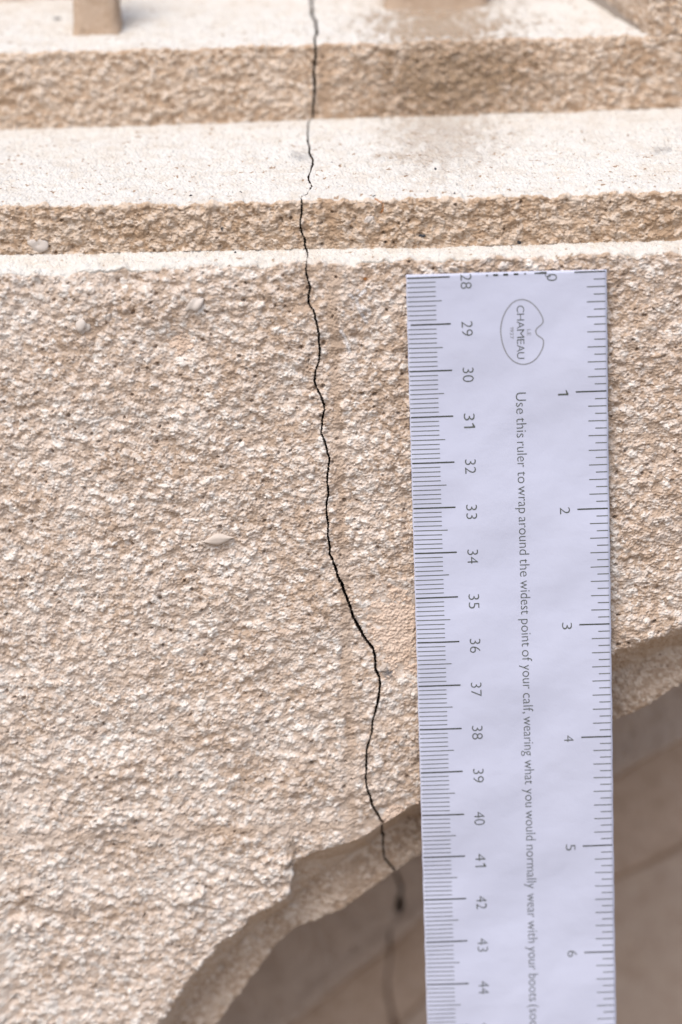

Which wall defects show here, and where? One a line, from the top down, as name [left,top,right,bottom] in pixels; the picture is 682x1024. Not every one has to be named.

crack [299,0,404,1024]
spalling [357,577,417,687]
spalling [381,800,420,823]